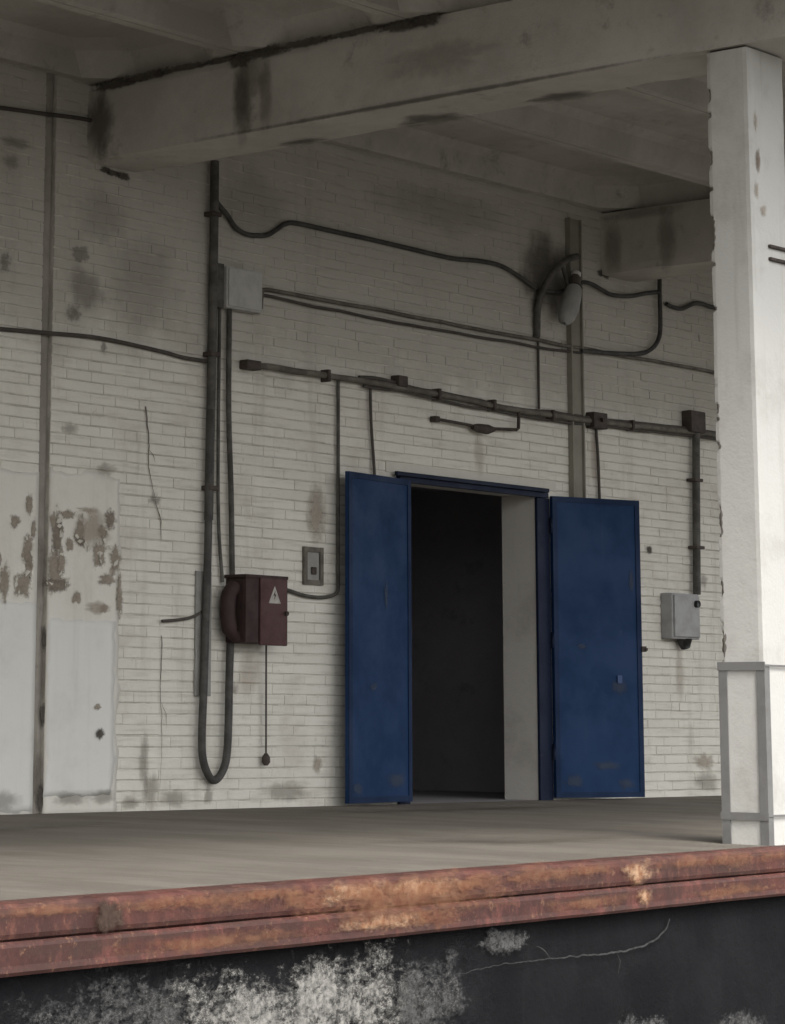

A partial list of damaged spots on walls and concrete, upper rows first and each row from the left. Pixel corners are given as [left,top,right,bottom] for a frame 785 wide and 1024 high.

leakage [235,74,248,118]
crack [145,406,161,539]
flaking render [0,495,36,603]
flaking render [46,509,122,618]
corrosion [322,879,472,902]
corrosion [625,864,650,902]
corrosion [349,913,412,928]
crack [457,919,670,974]